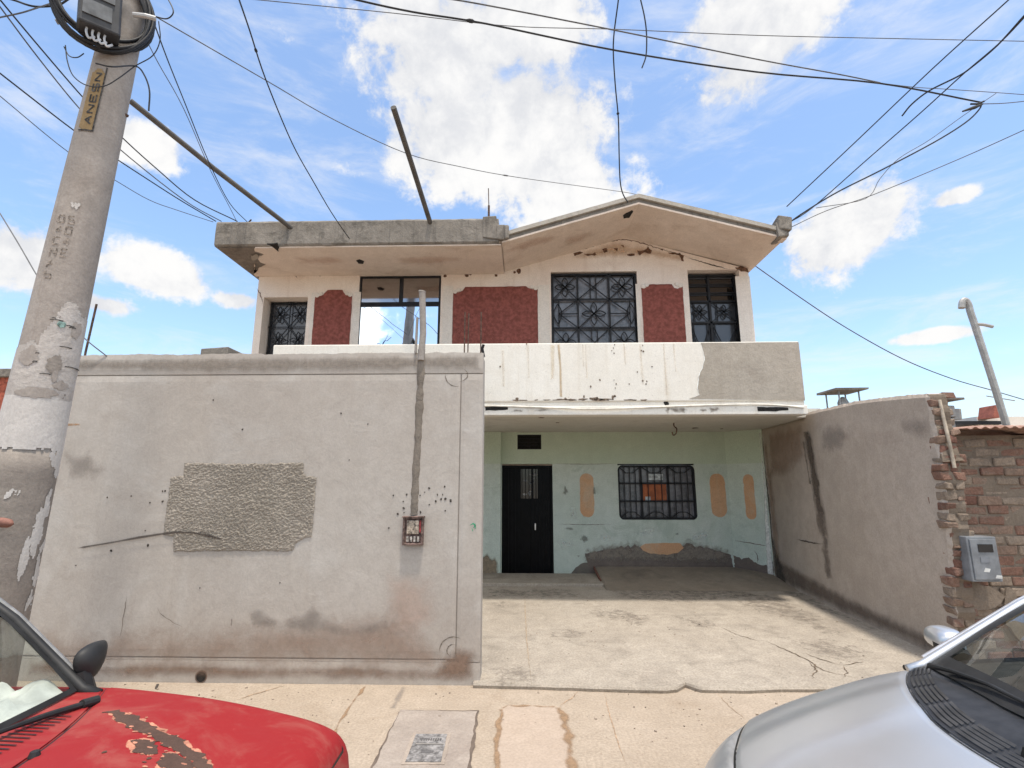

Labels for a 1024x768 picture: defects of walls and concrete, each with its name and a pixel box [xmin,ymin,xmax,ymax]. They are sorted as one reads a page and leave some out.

peeling [14,344,69,398]
peeling [690,342,805,400]
water stain [767,432,930,646]
crack [728,630,861,677]